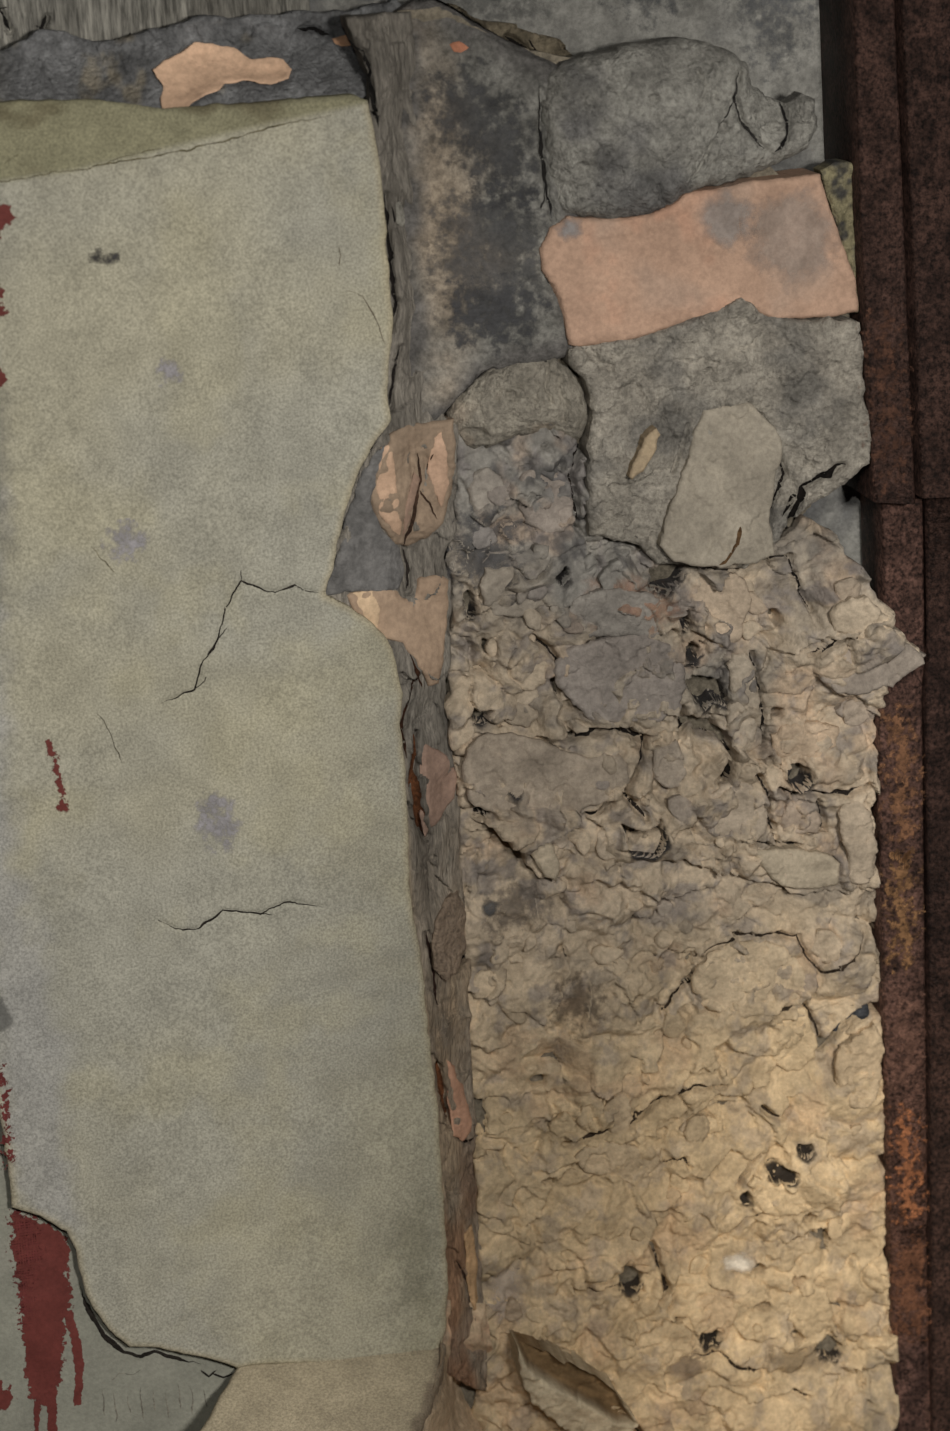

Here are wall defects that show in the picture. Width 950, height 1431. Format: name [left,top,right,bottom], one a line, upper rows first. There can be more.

rust [862,308,912,494]
crack [164,572,327,702]
spalling [326,11,926,1431]
crack [158,901,321,931]
crack [661,931,863,1010]
crack [771,1003,869,1036]
rust [878,704,929,1225]
crack [582,1084,722,1139]
crack [651,1248,668,1292]
rust [886,1239,932,1342]
crack [80,1286,233,1421]
crack [696,1350,758,1373]